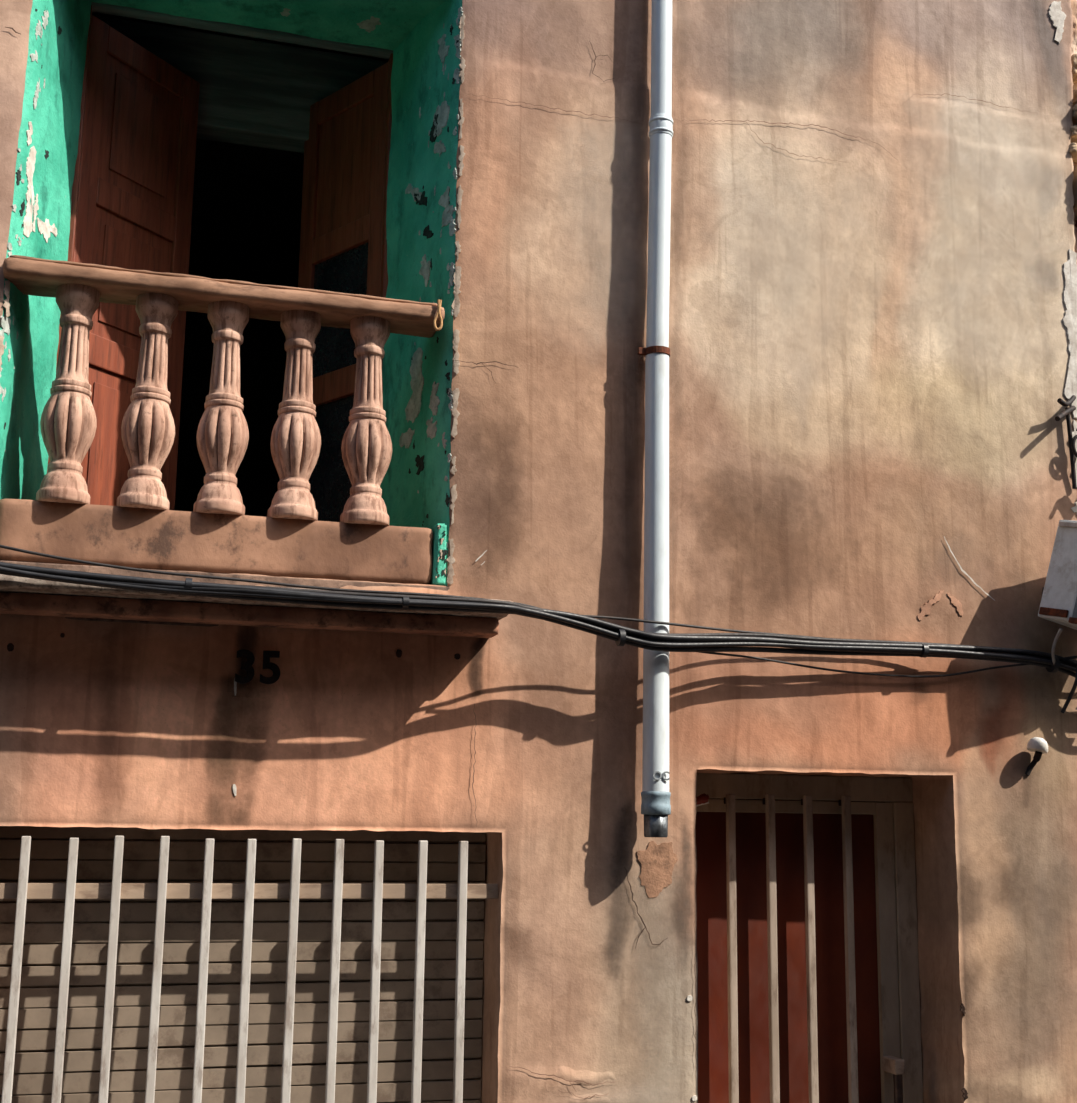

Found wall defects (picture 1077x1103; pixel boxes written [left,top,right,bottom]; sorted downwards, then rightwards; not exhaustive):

peeling [30,8,62,109]
spalling [1048,1,1066,44]
peeling [7,122,57,258]
crack [682,119,895,162]
peeling [0,280,19,402]
peeling [399,7,466,585]
spalling [1062,249,1077,482]
damp [210,626,258,778]
crack [624,867,667,949]
spalling [637,841,678,898]